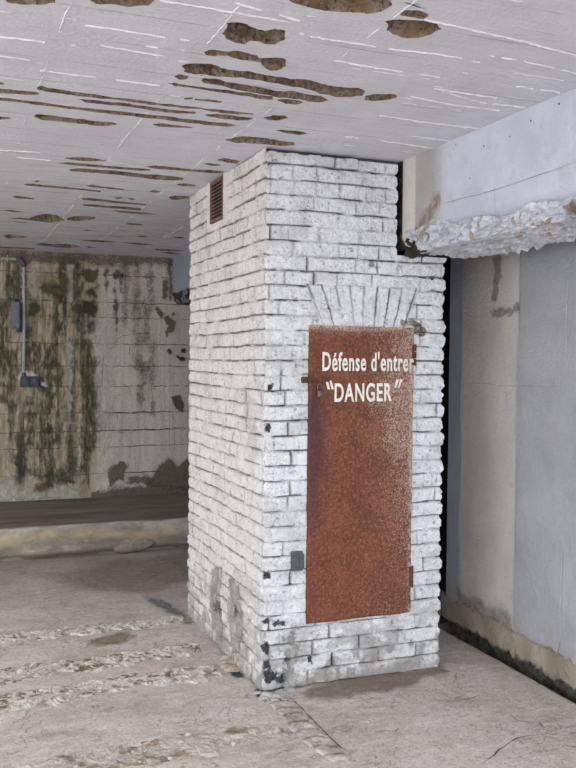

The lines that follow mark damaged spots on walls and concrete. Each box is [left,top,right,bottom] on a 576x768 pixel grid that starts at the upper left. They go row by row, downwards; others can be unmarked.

spalling [385,10,441,38]
spalling [0,22,397,128]
spalling [226,115,307,146]
spalling [60,157,240,186]
spalling [0,180,183,254]
spalling [405,195,576,259]
spalling [156,280,191,336]
water stain [0,262,190,501]